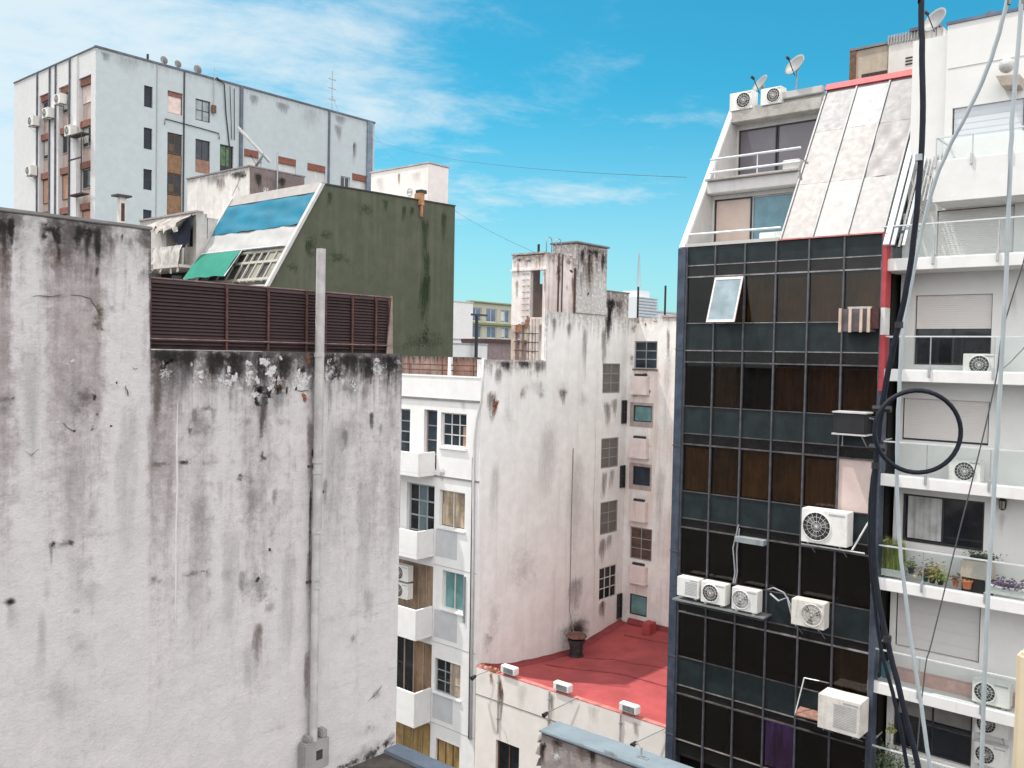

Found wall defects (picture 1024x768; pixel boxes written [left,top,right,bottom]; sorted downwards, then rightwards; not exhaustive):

damp [0,219,15,263]
damp [42,224,61,259]
damp [76,226,123,274]
damp [581,249,605,295]
damp [156,350,195,378]
damp [209,353,243,376]
flaking render [190,356,311,405]
damp [257,355,291,383]
damp [324,354,397,380]